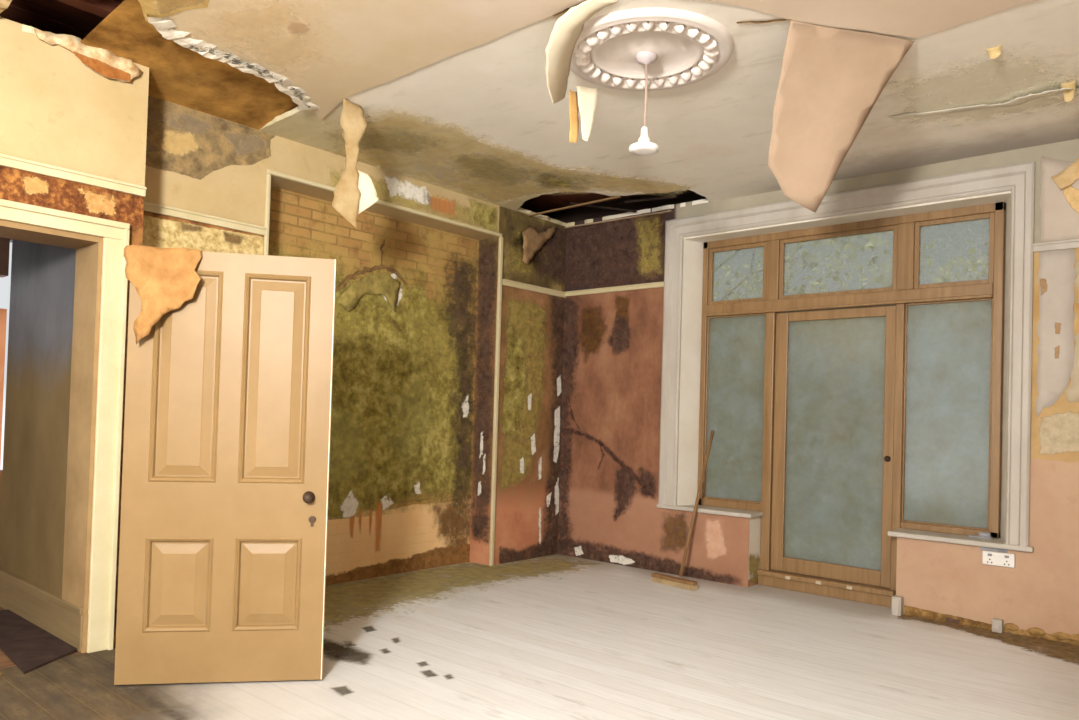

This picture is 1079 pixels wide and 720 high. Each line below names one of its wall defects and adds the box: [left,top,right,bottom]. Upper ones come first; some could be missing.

flaking render [34,0,320,180]
peeling [1051,158,1079,190]
leakage [323,114,688,664]
flaking render [1039,411,1079,455]
leakage [898,614,1079,664]
leakage [119,685,186,720]
leakage [332,686,352,695]
leakage [417,662,453,679]